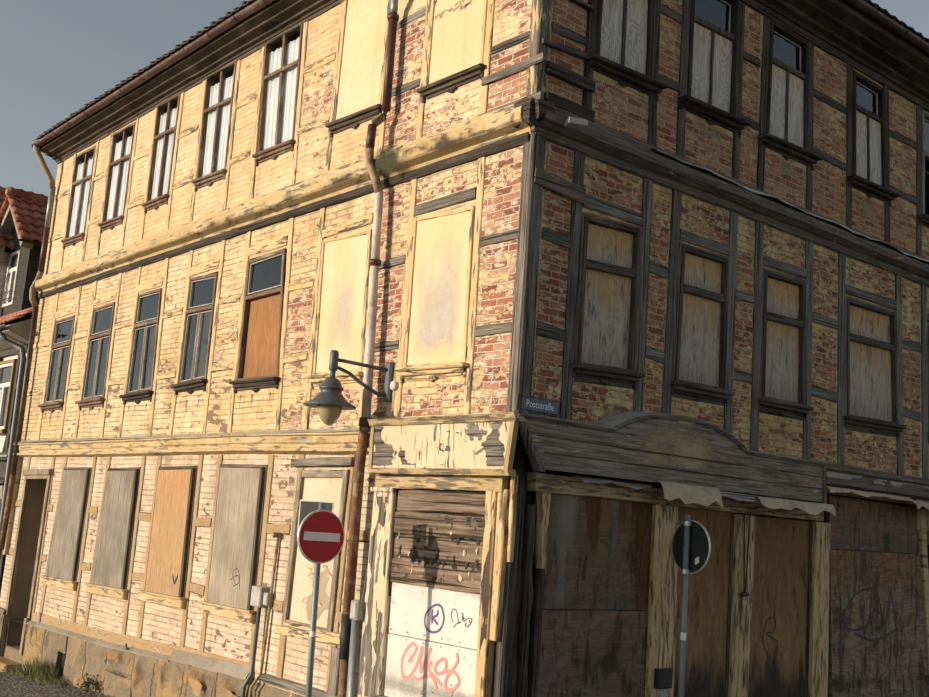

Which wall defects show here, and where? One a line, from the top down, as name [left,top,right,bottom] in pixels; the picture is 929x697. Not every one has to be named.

crack [435,0,472,19]
spalling [207,314,238,433]
peeling [274,287,318,443]
peeling [328,388,360,428]
peeling [371,145,523,466]
peeling [302,565,332,621]
peeling [356,477,494,697]